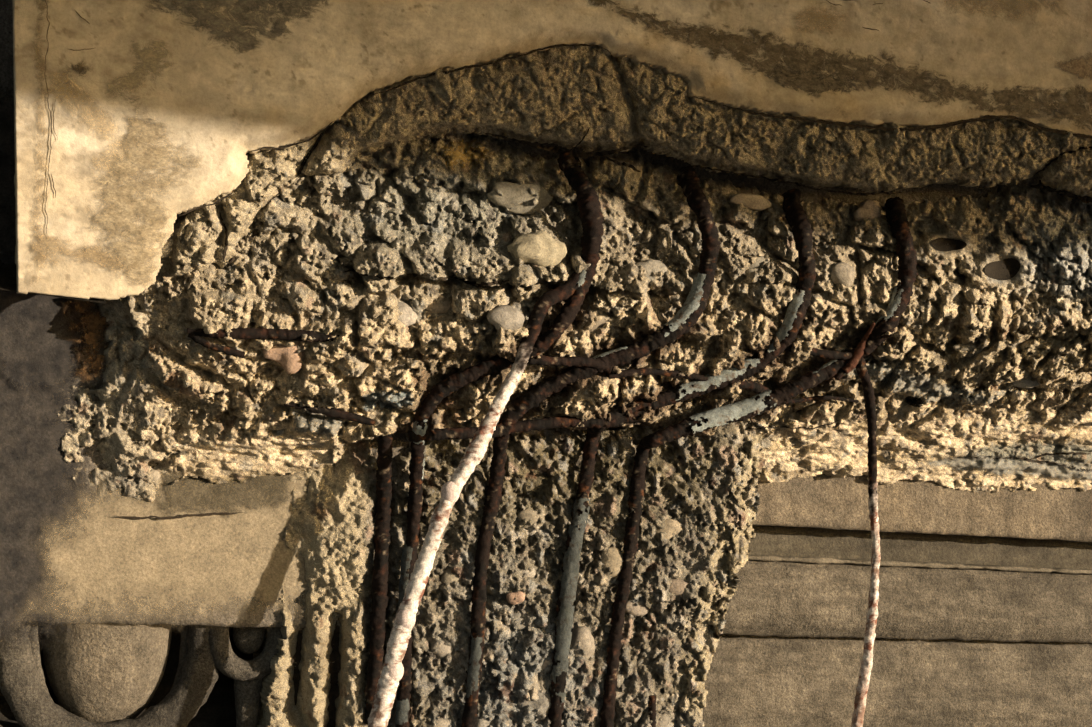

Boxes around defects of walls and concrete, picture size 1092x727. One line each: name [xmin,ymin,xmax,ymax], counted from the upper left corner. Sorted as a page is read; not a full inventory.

water stain [150,0,328,53]
water stain [590,0,1092,130]
crack [826,0,883,31]
peeling [1057,52,1092,79]
rust [65,299,110,379]
spalling [45,133,1092,727]